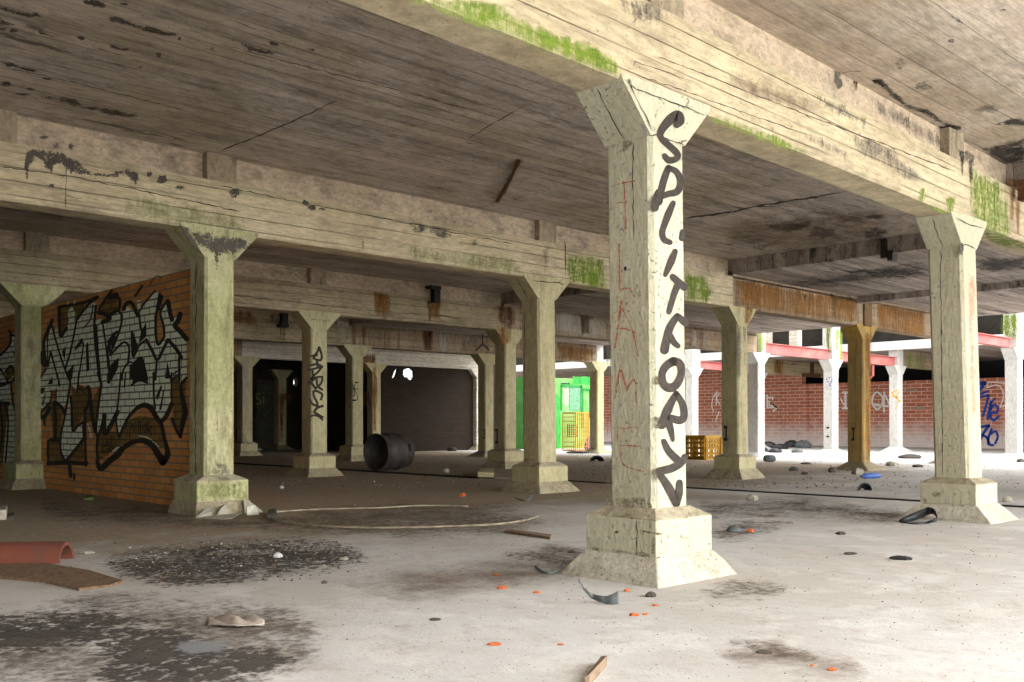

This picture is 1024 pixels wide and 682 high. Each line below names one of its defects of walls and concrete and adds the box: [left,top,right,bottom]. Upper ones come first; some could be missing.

crack [222,101,335,151]
crack [597,57,956,241]
water stain [878,103,940,143]
rust [738,282,857,323]